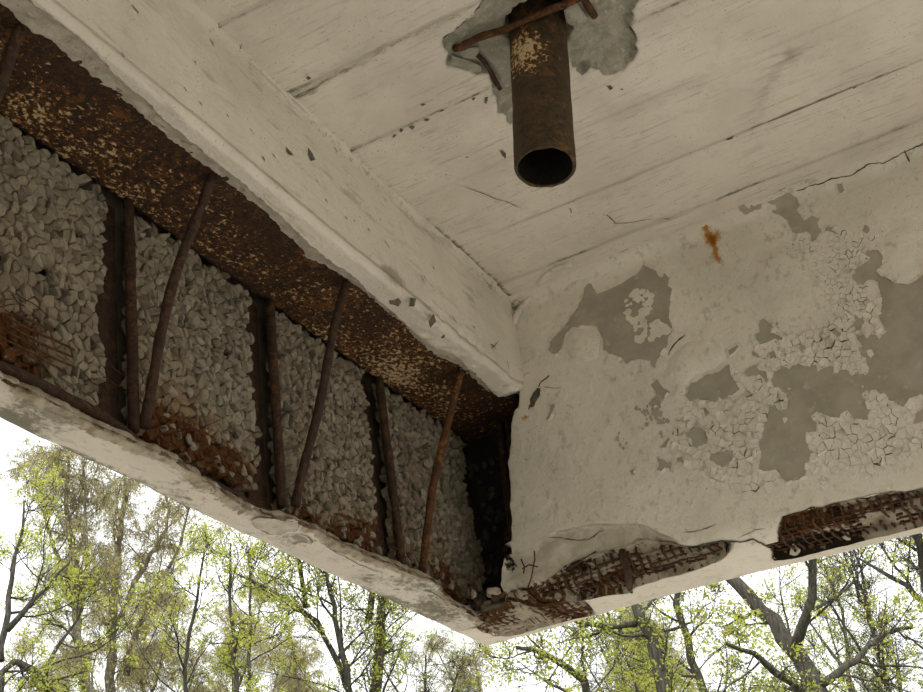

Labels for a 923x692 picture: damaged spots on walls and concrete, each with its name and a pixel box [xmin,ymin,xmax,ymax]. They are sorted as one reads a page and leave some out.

spalling [442,0,639,124]
spalling [0,0,504,397]
rust [703,225,720,262]
crack [764,143,923,204]
spalling [0,115,734,637]
peeling [544,193,923,494]
spalling [766,488,923,561]